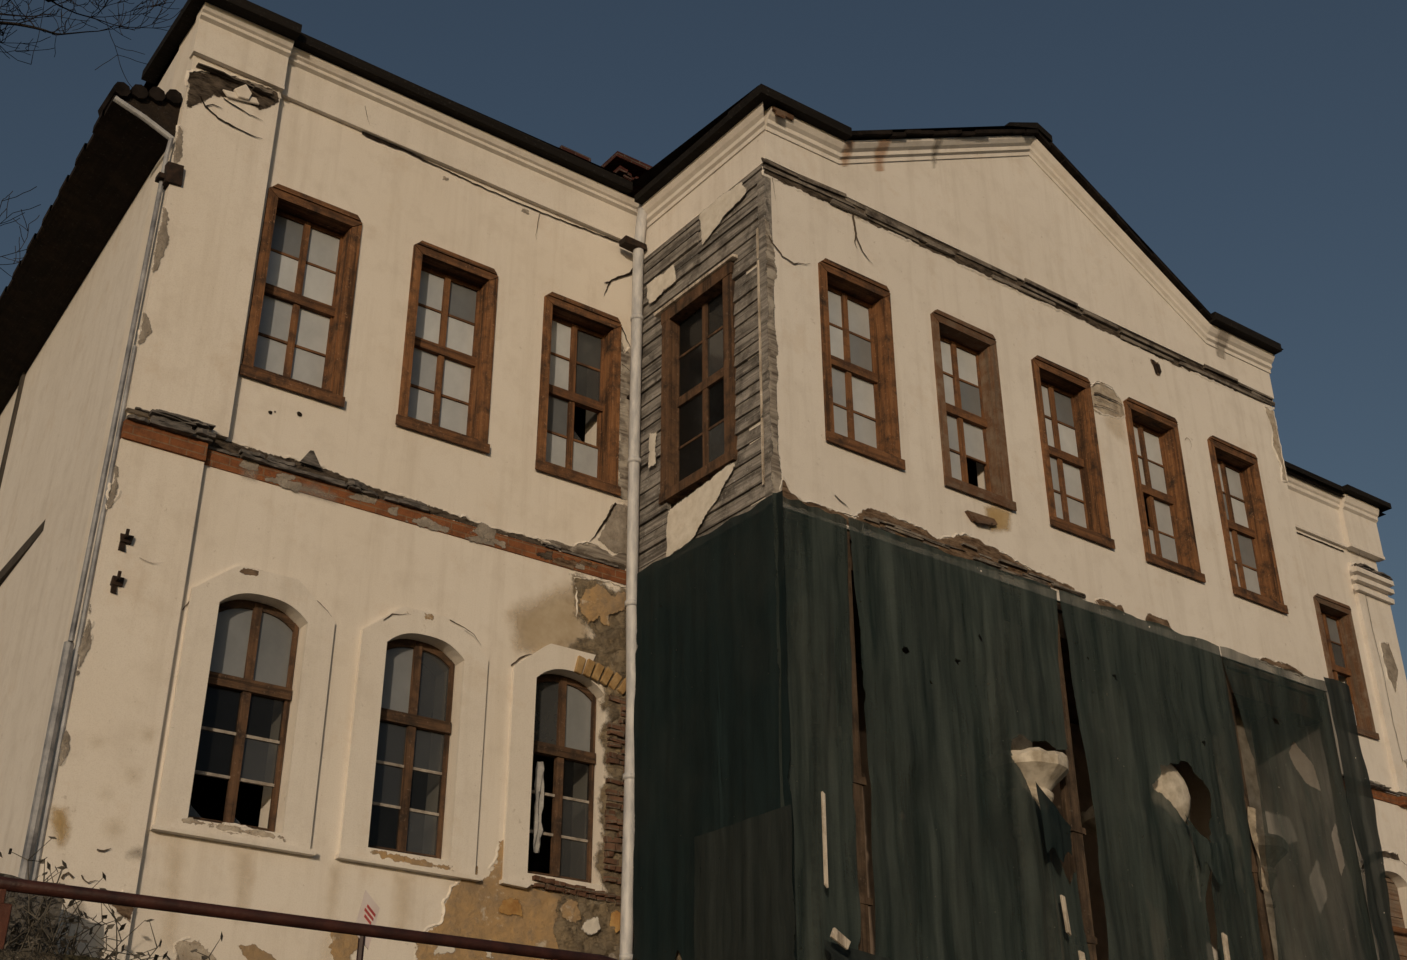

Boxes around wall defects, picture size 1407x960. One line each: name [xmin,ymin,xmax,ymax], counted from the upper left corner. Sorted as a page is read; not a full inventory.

spalling [184,62,282,110]
spalling [173,124,184,164]
crack [852,214,870,261]
spalling [761,157,1288,483]
spalling [764,219,1126,613]
peeling [210,332,637,960]
water stain [517,589,586,652]
spalling [1379,641,1398,694]
spalling [173,936,216,960]